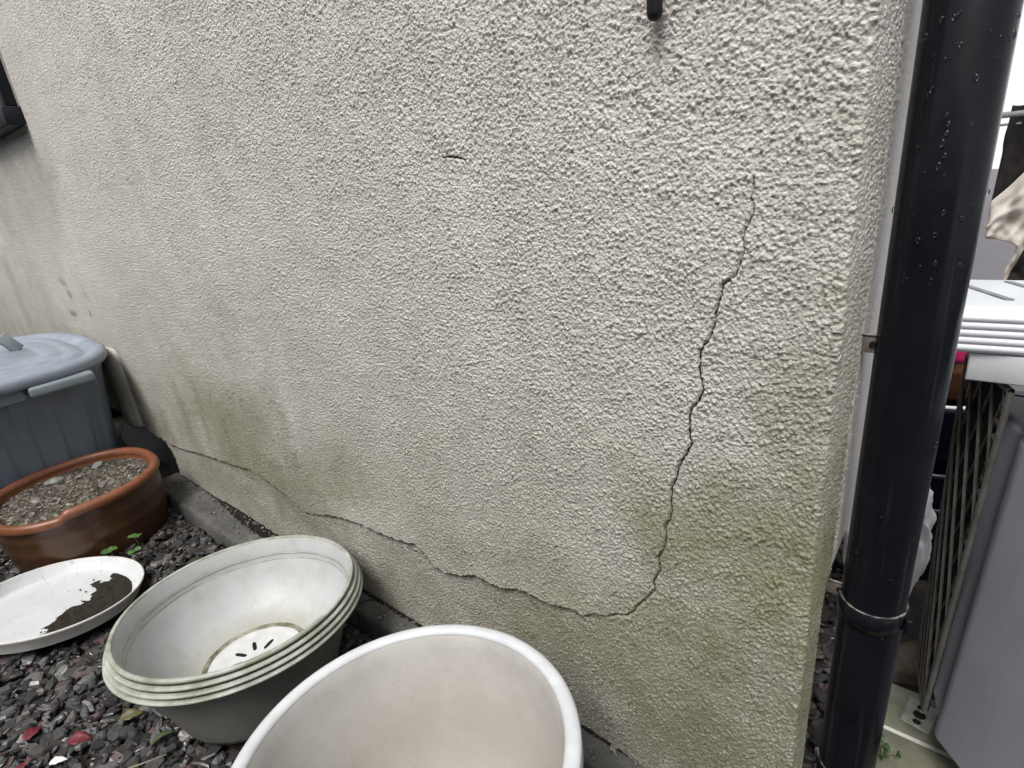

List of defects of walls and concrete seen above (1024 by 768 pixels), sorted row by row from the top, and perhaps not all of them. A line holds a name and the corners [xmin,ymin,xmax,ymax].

crack [328,182,755,617]